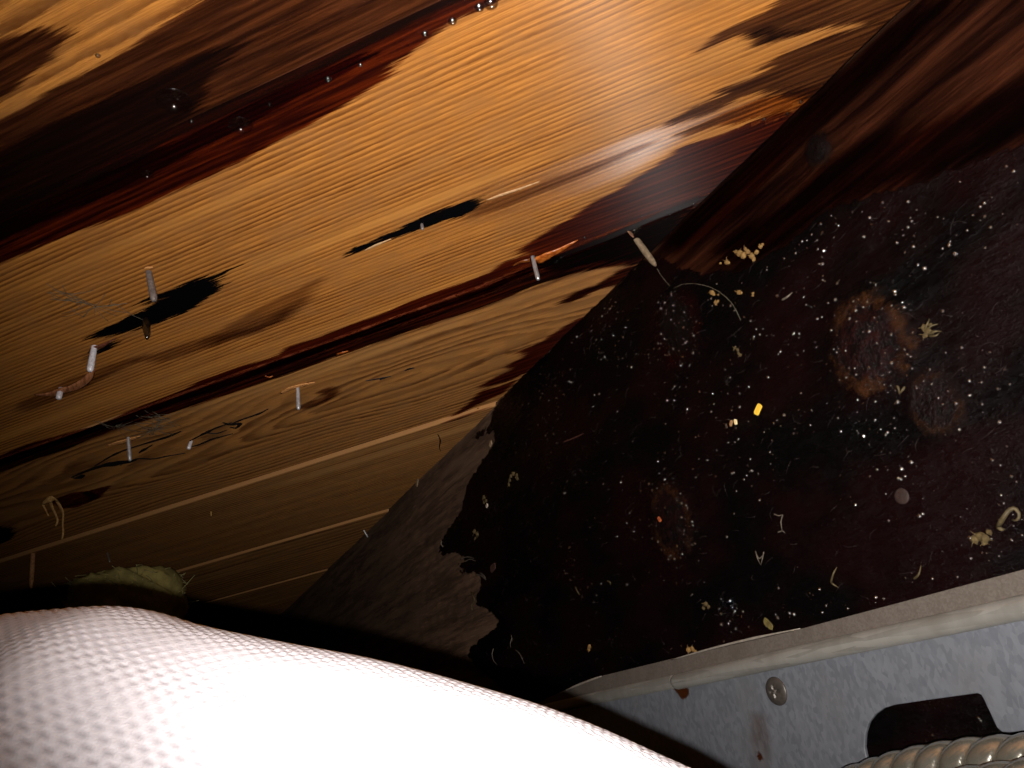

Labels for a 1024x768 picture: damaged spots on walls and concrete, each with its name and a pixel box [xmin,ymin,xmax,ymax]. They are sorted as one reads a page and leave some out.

crack [71,409,268,479]
water stain [0,0,1024,472]